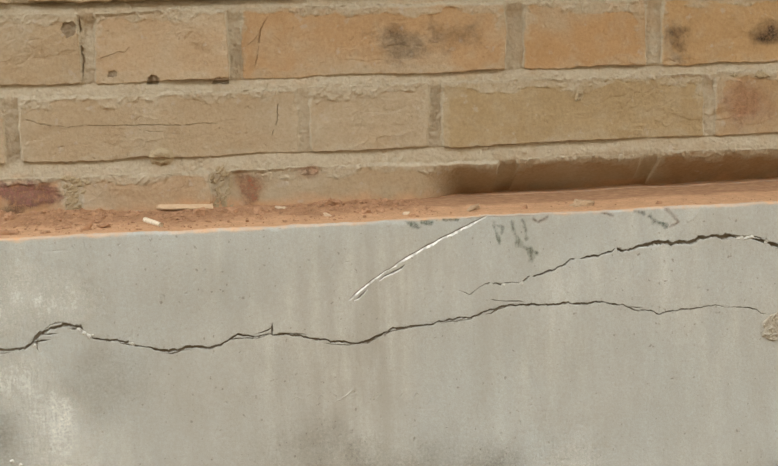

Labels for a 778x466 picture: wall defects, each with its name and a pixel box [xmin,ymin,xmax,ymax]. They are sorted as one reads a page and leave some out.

crack [0,230,778,357]
crack [349,216,488,303]
spalling [762,312,778,341]